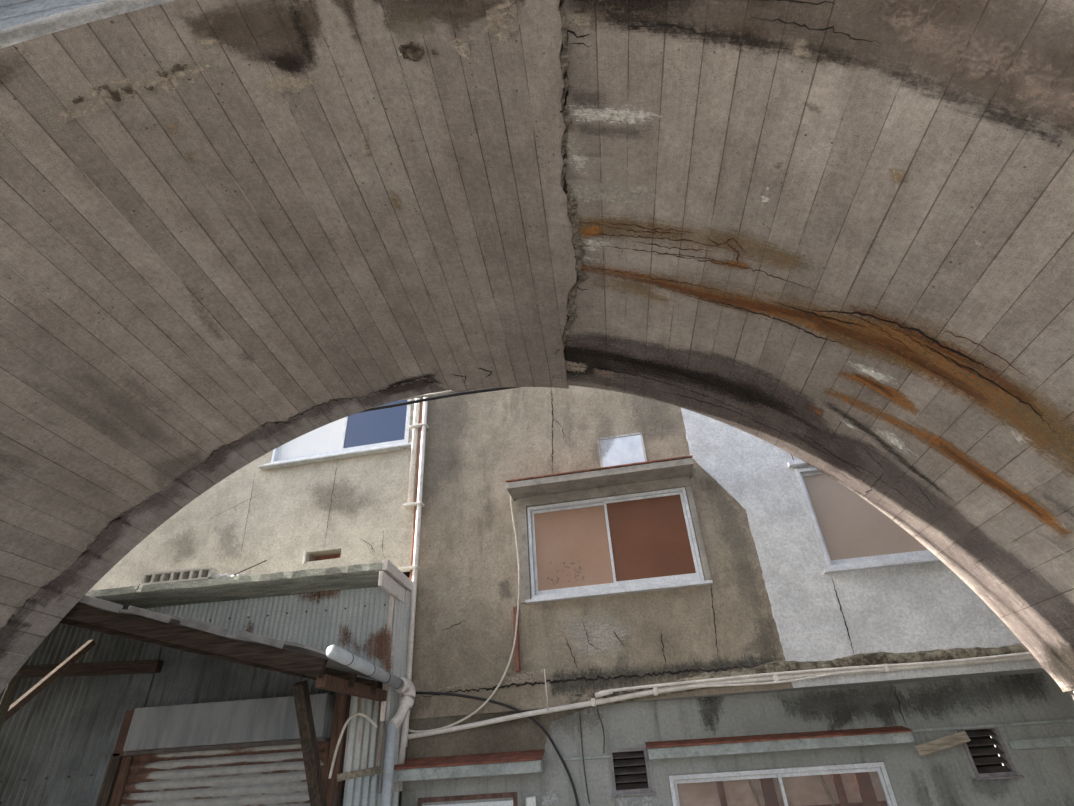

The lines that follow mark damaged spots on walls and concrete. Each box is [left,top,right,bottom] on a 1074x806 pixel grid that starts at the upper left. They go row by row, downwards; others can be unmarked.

peeling [48,60,210,122]
damp [186,0,319,74]
damp [334,0,360,41]
damp [378,0,510,31]
crack [558,0,590,194]
damp [568,0,1074,142]
rust [580,215,818,292]
rust [581,265,1074,473]
rust [825,372,1071,534]
damp [552,334,1074,731]